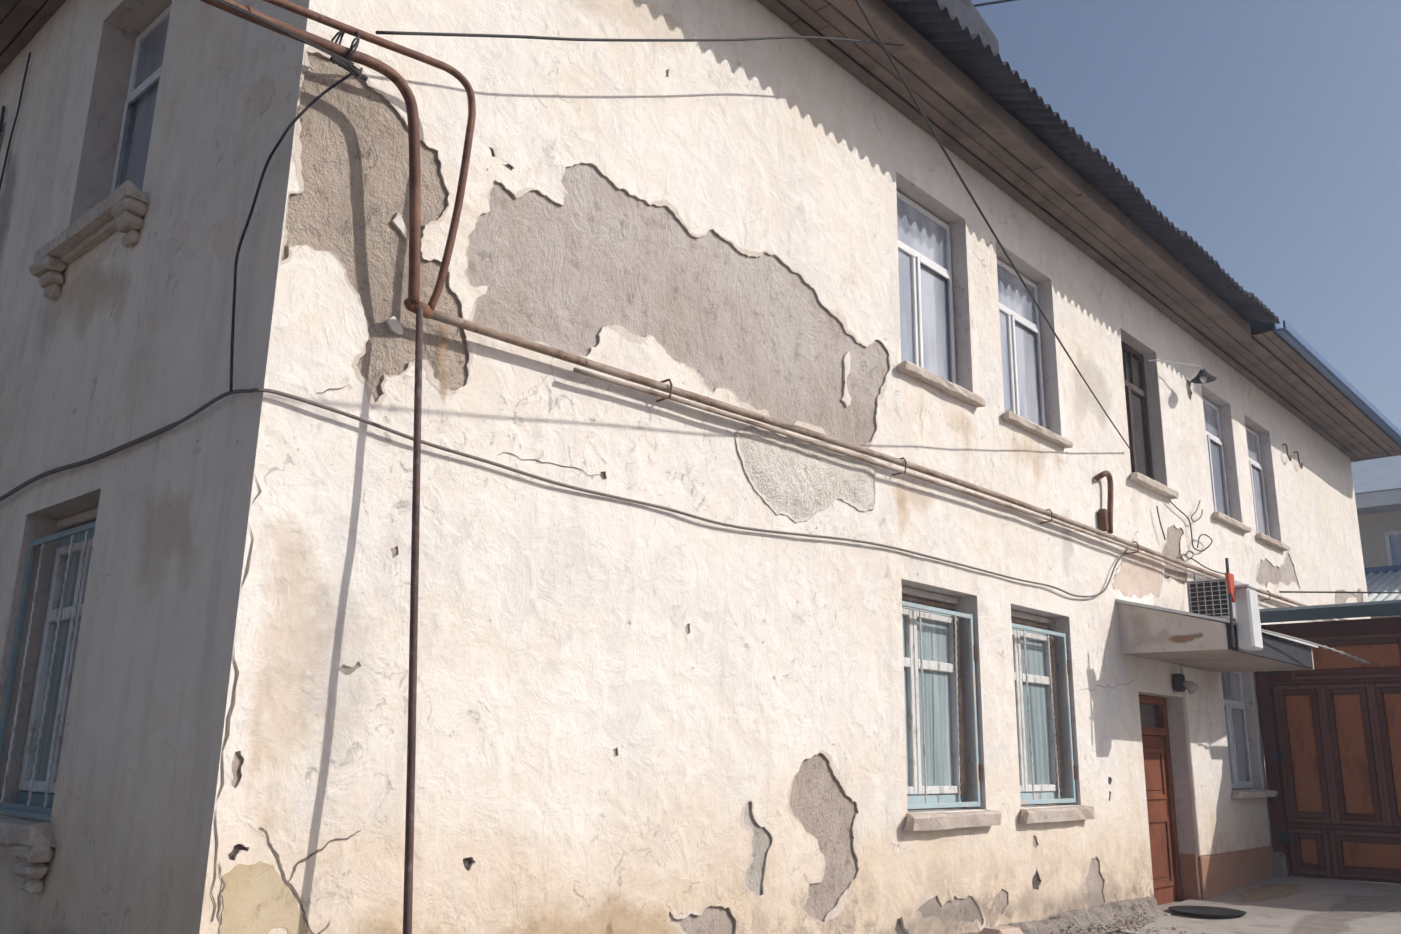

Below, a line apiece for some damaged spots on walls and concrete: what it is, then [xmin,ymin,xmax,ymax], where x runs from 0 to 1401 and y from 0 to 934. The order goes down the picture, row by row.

flaking render [281,46,890,455]
crack [241,476,262,590]
flaking render [1256,551,1300,589]
crack [211,649,239,925]
peeling [219,844,310,934]
crack [259,827,361,934]
flaking render [669,906,737,934]
flaking render [741,799,773,898]
flaking render [788,750,860,924]